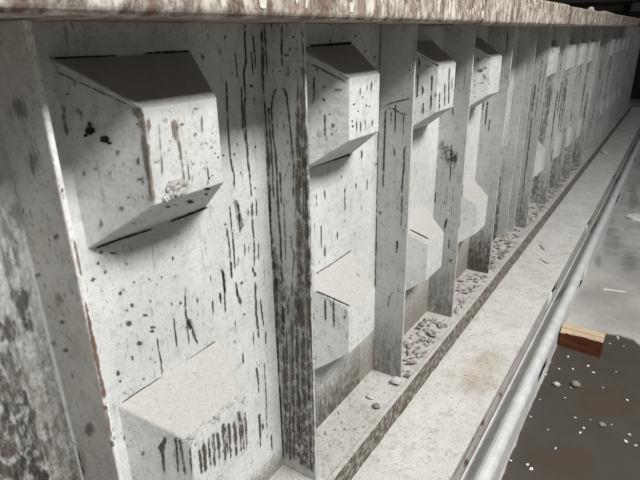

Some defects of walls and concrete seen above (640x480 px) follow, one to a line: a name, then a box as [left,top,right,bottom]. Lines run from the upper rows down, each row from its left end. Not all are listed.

damp [267,88,295,286]
damp [352,59,453,286]
corrosion [85,303,112,437]
damp [158,437,166,472]
damp [174,411,248,474]